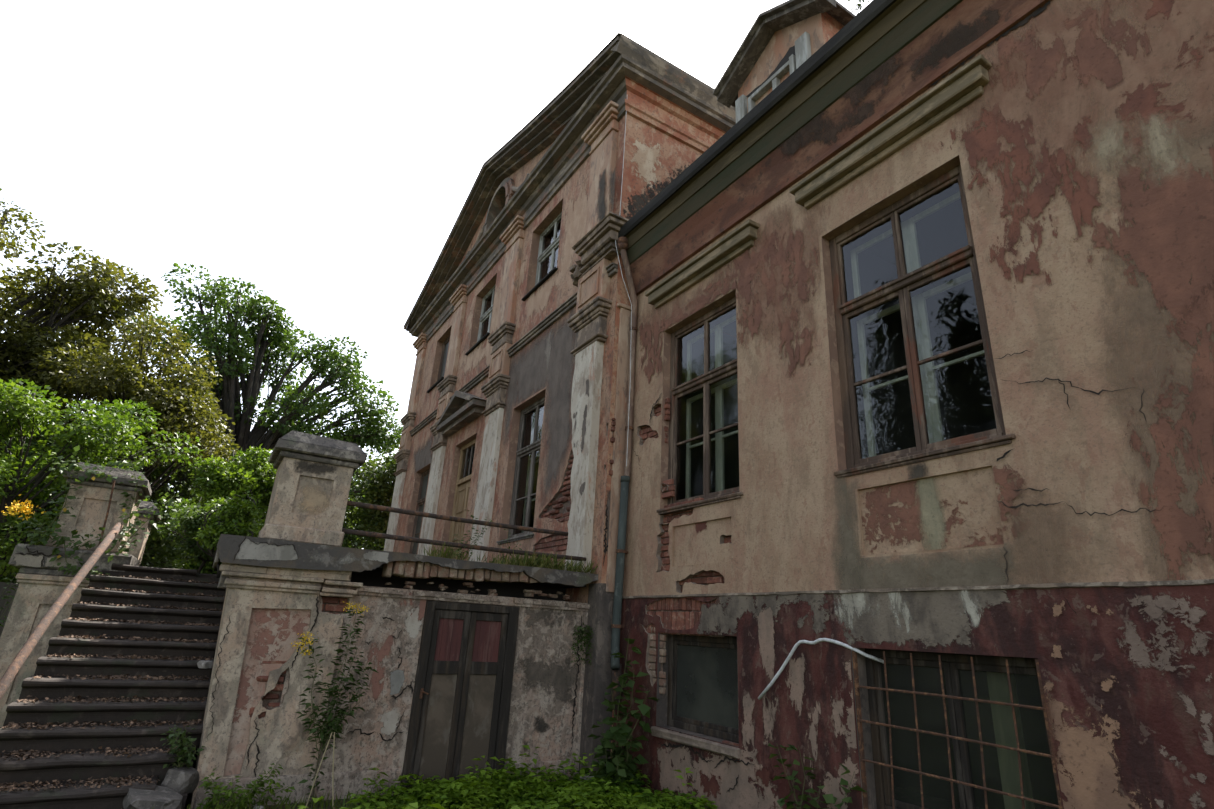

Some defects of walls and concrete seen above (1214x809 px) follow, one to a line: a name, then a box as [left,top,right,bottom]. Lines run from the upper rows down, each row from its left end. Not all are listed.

peeling [941,0,1202,288]
crack [995,350,1146,420]
flaking render [535,379,589,552]
flaking render [660,478,707,571]
crack [996,488,1168,516]
crack [206,616,231,742]
crack [246,718,260,777]
peeling [232,593,348,723]
crack [289,595,319,670]
spalling [351,551,570,639]
peeling [644,571,1011,809]
peeling [1043,675,1164,809]